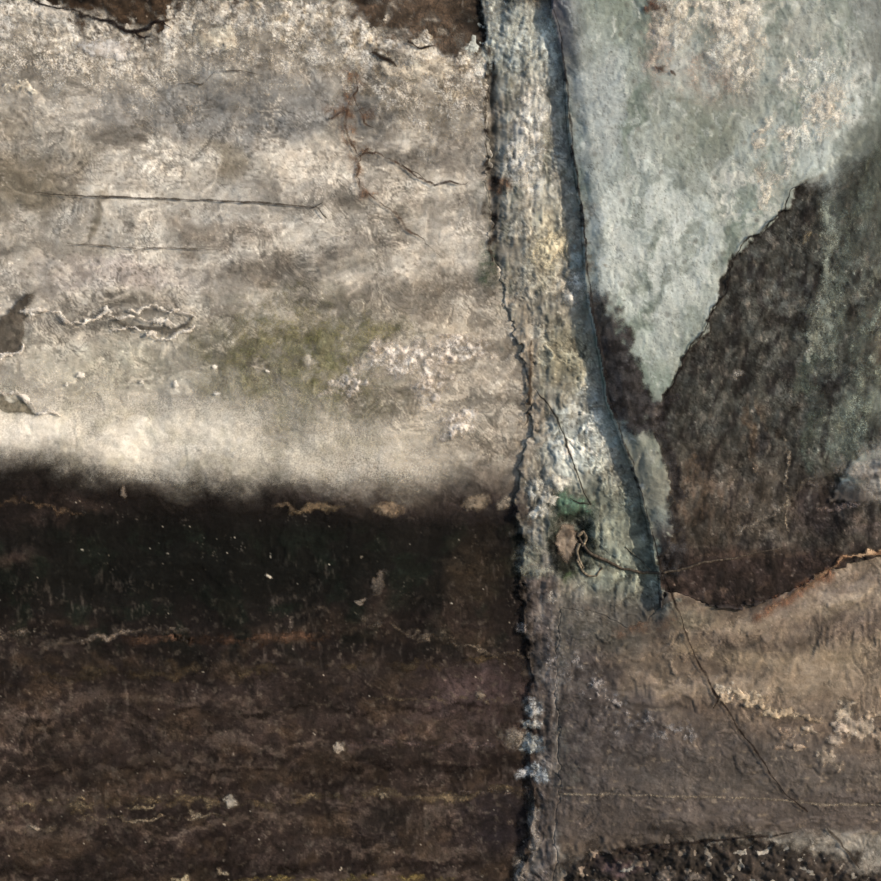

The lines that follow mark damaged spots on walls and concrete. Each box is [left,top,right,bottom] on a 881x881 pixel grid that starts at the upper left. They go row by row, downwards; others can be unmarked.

crack [32,0,172,38]
water stain [0,0,559,145]
crack [34,192,326,218]
crack [482,36,507,261]
peeling [0,293,196,360]
peeling [0,390,62,416]
crack [522,340,591,505]
water stain [561,272,689,580]
crack [553,9,880,812]
water stain [0,380,583,881]
water stain [582,678,628,713]
corrosion [755,549,881,620]